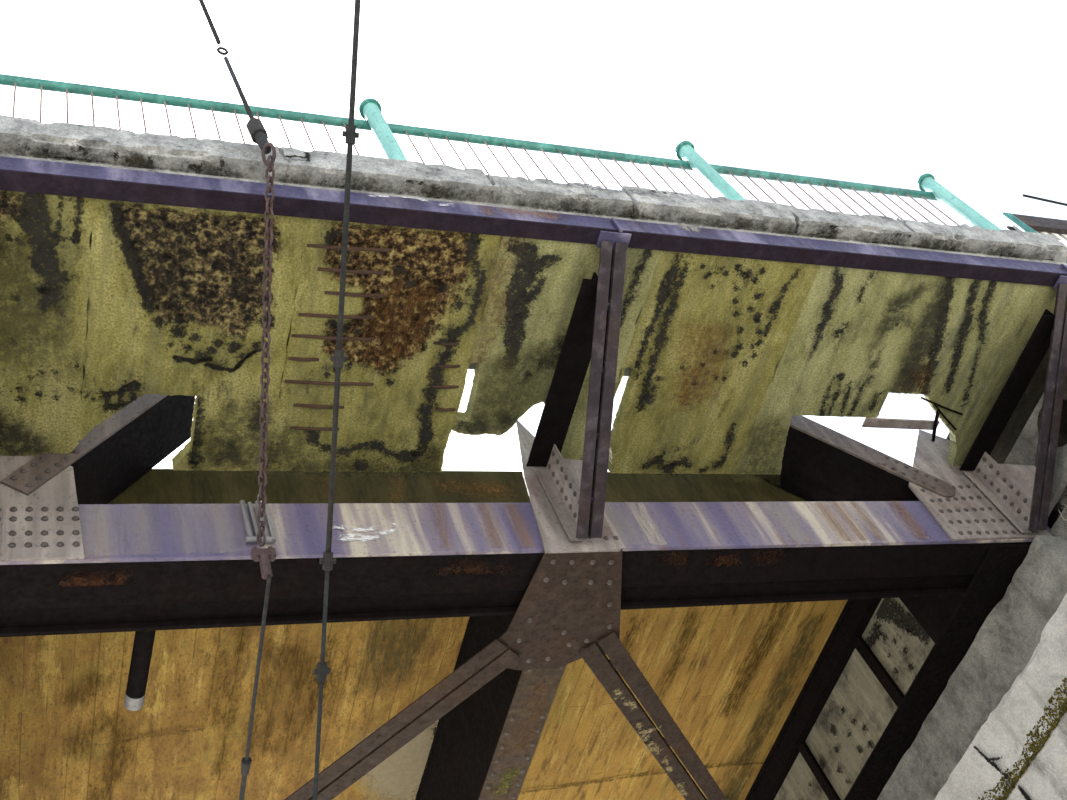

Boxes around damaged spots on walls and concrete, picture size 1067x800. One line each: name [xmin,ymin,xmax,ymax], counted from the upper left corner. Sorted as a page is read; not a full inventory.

leakage [140,216,213,324]
leakage [620,249,652,327]
leakage [631,253,690,414]
leakage [751,265,803,360]
leakage [805,267,850,358]
leakage [818,277,997,417]
crack [973,746,1032,800]